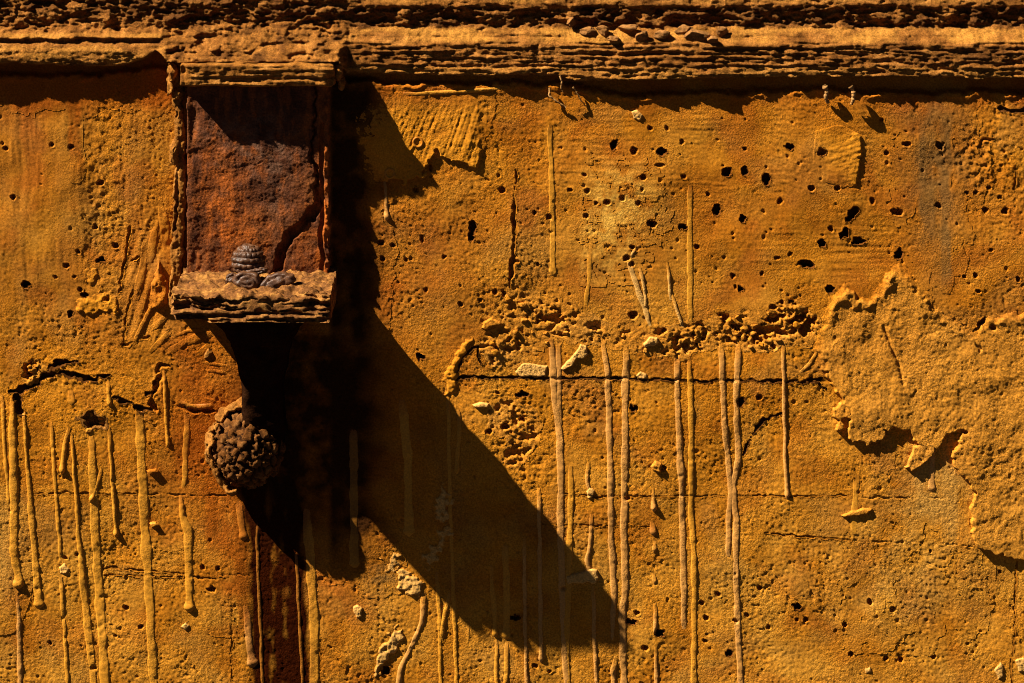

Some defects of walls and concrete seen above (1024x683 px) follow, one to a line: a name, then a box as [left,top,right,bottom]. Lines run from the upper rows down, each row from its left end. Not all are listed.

crack [8,359,171,416]
crack [456,345,827,390]
peeling [442,263,1024,560]
damp [0,483,33,635]
rust [144,327,319,683]